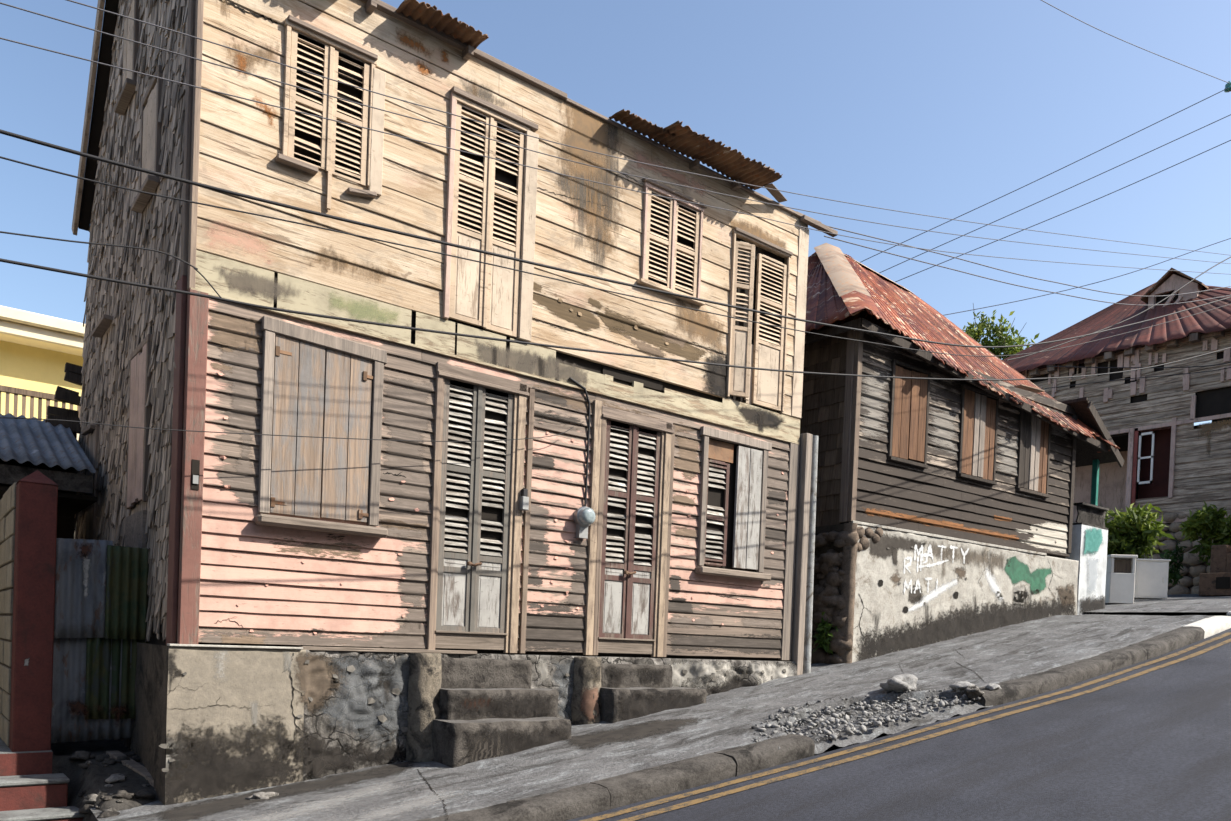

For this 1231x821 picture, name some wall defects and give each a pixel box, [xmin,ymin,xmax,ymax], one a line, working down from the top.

water stain [559,103,620,266]
water stain [588,298,784,432]
peeling [200,375,436,748]
peeling [518,503,600,723]
water stain [856,589,1105,661]
water stain [157,702,418,821]
water stain [354,792,451,821]